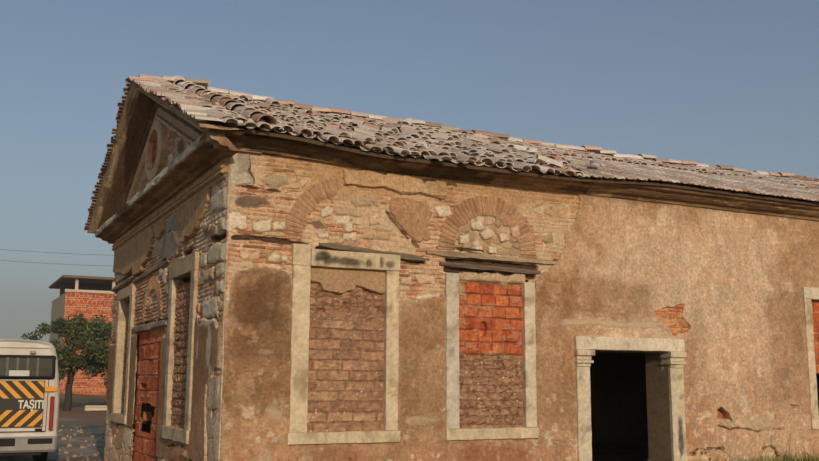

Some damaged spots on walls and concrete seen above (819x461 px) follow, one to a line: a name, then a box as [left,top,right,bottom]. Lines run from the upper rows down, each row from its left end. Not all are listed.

spalling [111,152,580,345]
spalling [654,304,691,335]
spalling [104,404,135,461]
spalling [687,447,731,461]